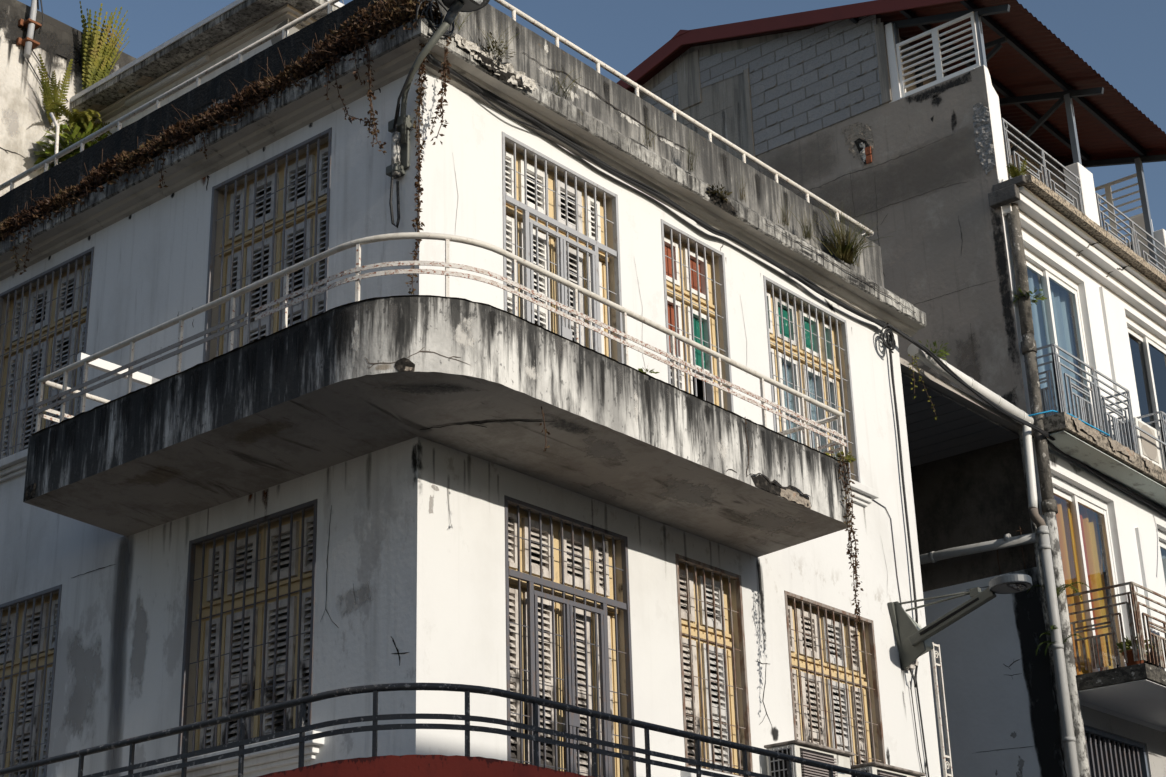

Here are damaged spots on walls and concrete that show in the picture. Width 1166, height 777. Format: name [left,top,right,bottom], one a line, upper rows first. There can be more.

damp [0,10,83,80]
damp [564,82,648,126]
damp [271,310,359,373]
crack [365,348,470,368]
damp [456,319,474,347]
damp [412,445,422,482]
spalling [750,473,812,509]
damp [109,537,132,777]